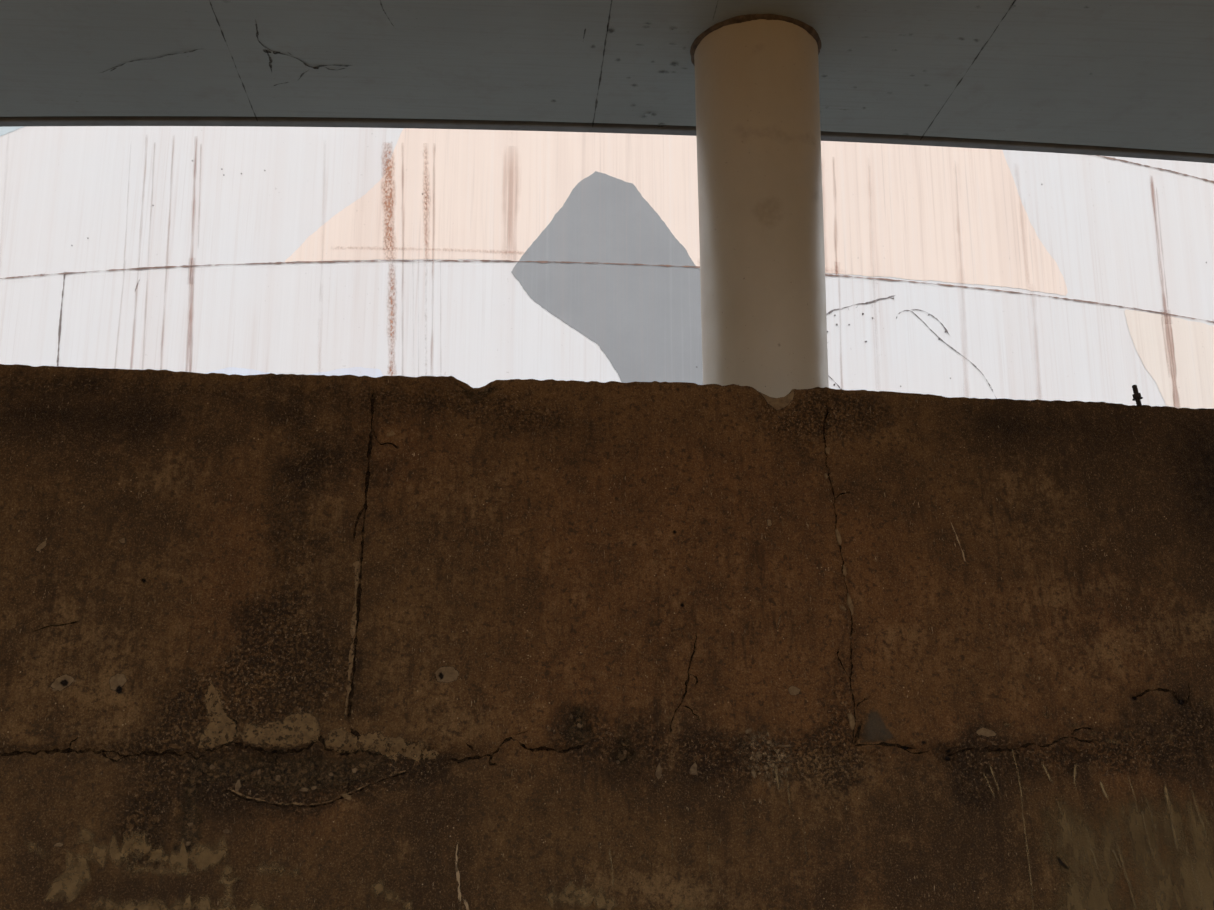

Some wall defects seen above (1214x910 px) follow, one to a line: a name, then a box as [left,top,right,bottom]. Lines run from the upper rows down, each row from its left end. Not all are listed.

crack [256,24,351,86]
rust [383,150,393,250]
crack [0,393,407,808]
crack [823,375,1097,758]
peeling [198,680,439,765]
crack [450,731,584,766]
crack [670,635,700,733]
crack [1135,684,1190,703]
leakage [1042,783,1214,910]